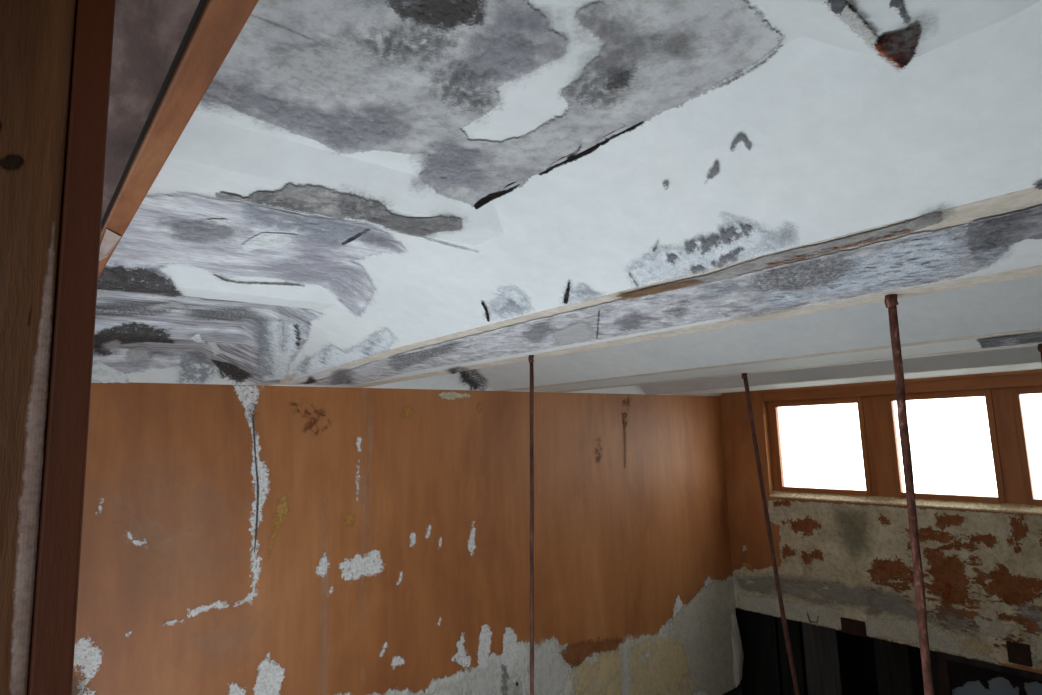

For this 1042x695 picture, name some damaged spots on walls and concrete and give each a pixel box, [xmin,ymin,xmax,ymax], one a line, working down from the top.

spalling [824,0,878,48]
rust [874,23,922,69]
peeling [889,0,912,25]
peeling [200,0,784,207]
crack [474,121,644,209]
leakage [257,319,305,381]
peeling [91,183,1042,627]
peeling [368,499,1042,695]
peeling [72,635,103,695]
peeling [228,652,285,695]